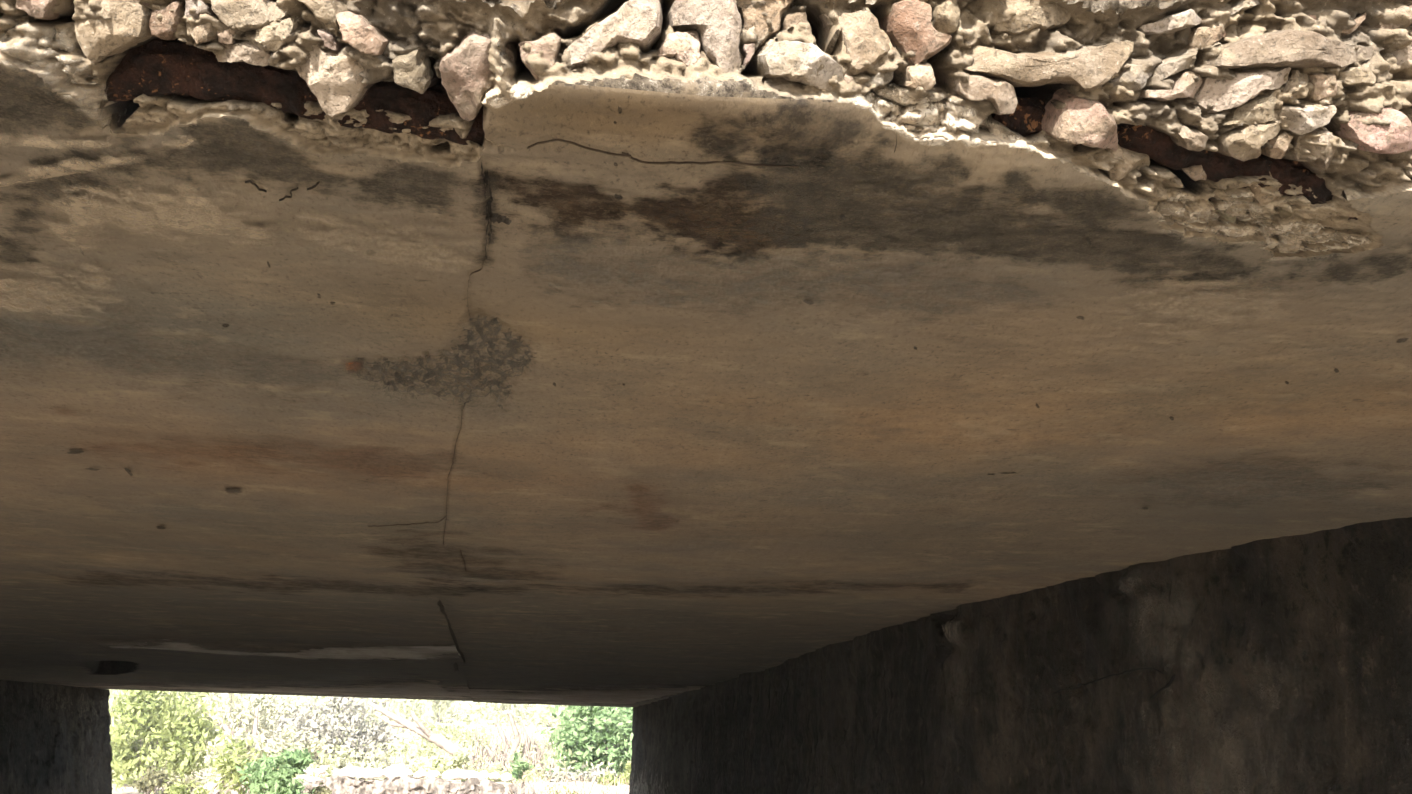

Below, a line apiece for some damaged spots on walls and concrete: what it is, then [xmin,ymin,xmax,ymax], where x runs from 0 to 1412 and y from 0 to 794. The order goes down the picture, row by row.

water stain [0,69,95,132]
water stain [0,118,458,314]
spalling [0,0,528,168]
crack [467,162,489,339]
crack [527,139,799,167]
water stain [473,95,1412,295]
spalling [819,0,1412,260]
crack [368,384,479,571]